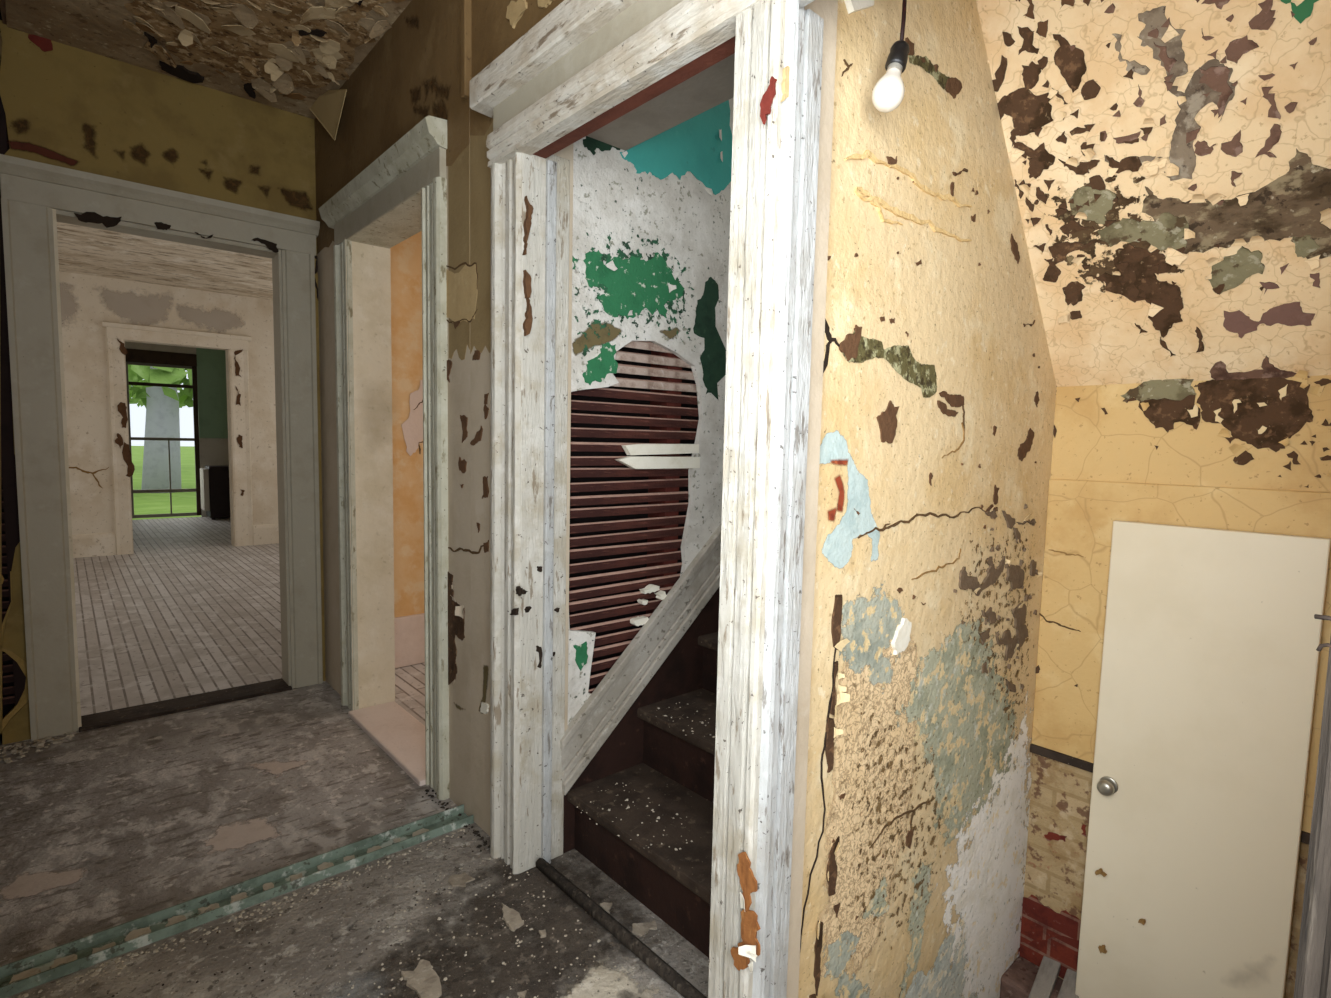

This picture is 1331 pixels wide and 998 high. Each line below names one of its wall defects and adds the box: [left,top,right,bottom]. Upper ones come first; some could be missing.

peeling [123,0,405,102]
peeling [988,0,1320,357]
peeling [458,393,489,488]
flaking render [554,229,726,694]
peeling [1017,428,1037,463]
peeling [1121,356,1331,488]
flaking render [448,572,465,686]
peeling [825,584,926,773]
peeling [895,485,1043,849]
crack [857,507,1083,745]
peeling [730,852,761,973]
peeling [809,836,880,998]